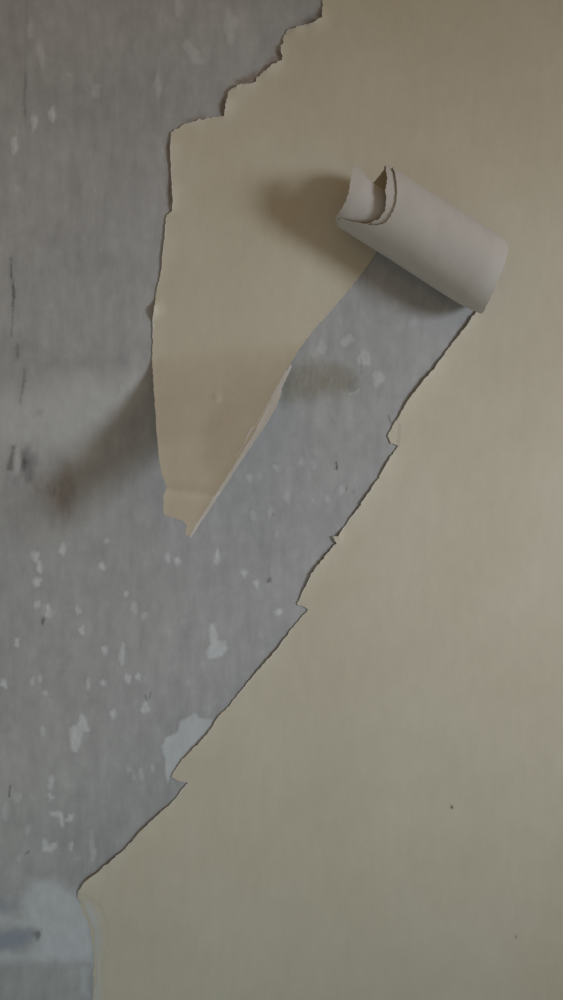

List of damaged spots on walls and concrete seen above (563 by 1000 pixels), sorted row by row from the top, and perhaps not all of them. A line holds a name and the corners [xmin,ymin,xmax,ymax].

peeling [152,332,312,537]
flaking render [28,549,54,627]
flaking render [203,621,231,662]
flaking render [66,710,93,754]
flaking render [40,772,76,855]